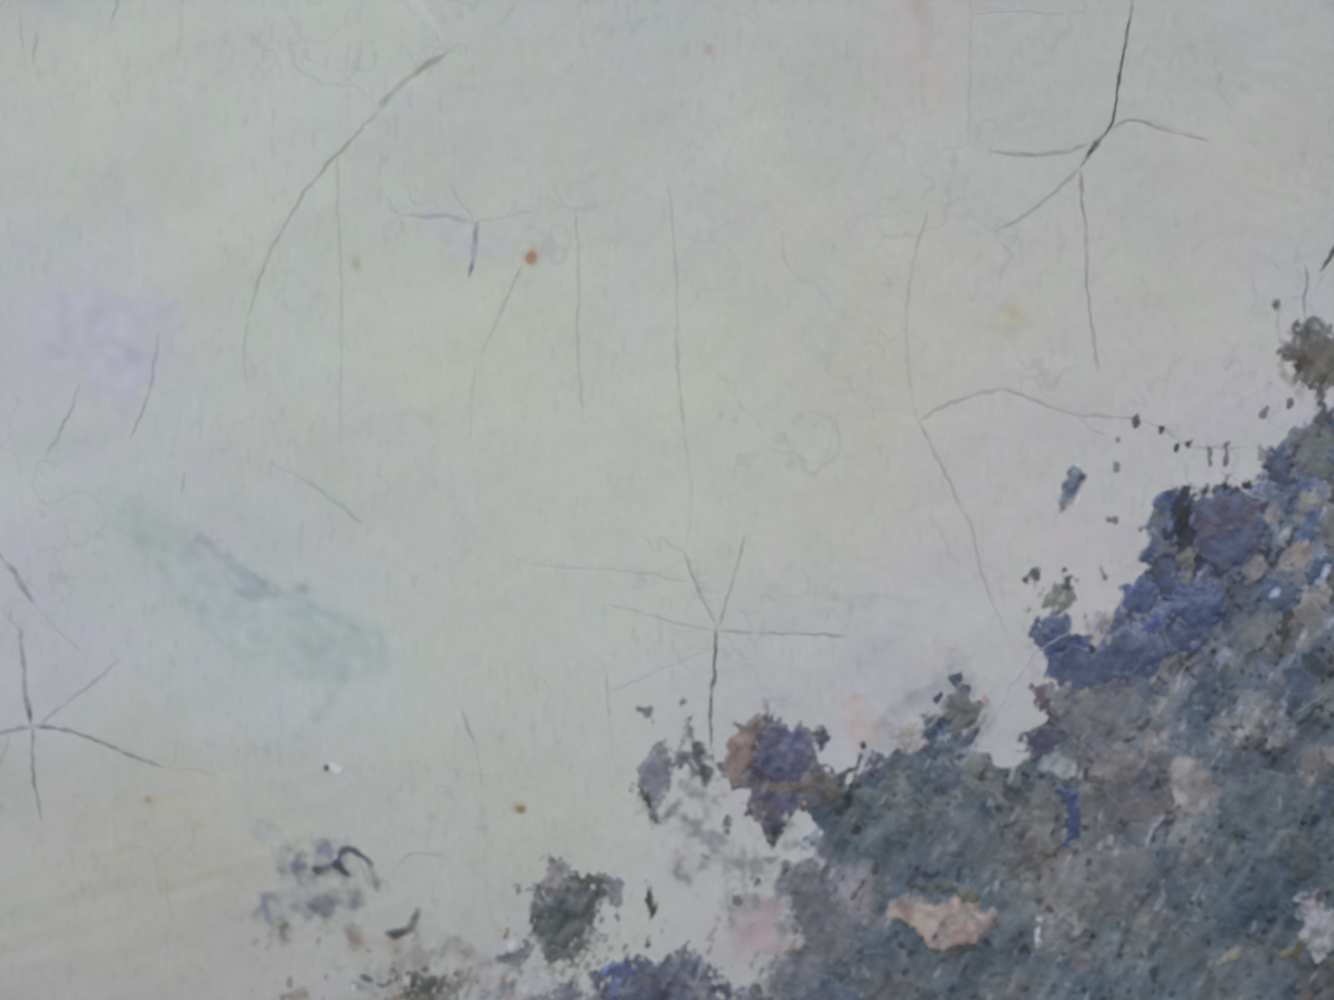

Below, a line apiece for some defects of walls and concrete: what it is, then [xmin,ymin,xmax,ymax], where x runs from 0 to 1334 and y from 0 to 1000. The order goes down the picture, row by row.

crack [0,553,216,820]
crack [607,179,846,751]
peeling [349,294,1334,1000]
crack [904,211,1248,635]
crack [988,0,1209,372]
crack [1302,245,1334,318]